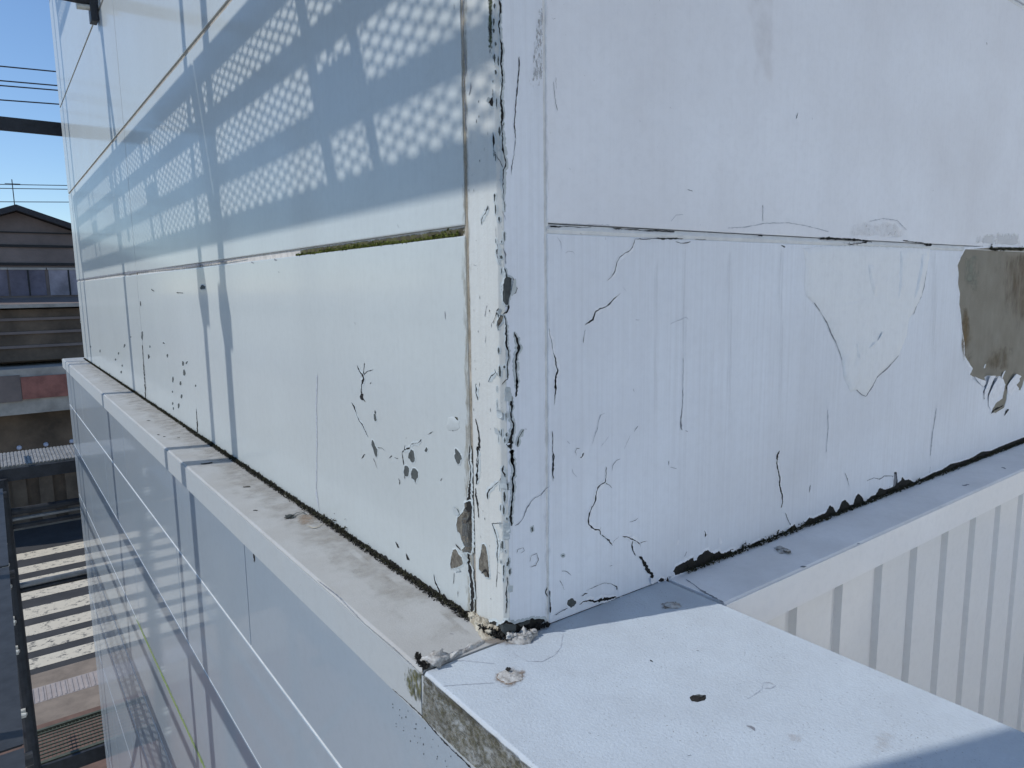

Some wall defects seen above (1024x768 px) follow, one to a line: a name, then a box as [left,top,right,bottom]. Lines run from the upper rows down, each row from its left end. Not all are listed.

peeling [486,0,503,109]
crack [475,1,520,266]
crack [729,222,829,232]
crack [583,239,635,343]
peeling [956,244,1024,415]
crack [351,363,432,484]
peeling [403,446,429,484]
peeling [454,447,463,466]
peeling [450,475,539,603]
peeling [494,345,512,444]
crack [433,306,654,613]
crack [775,451,791,525]